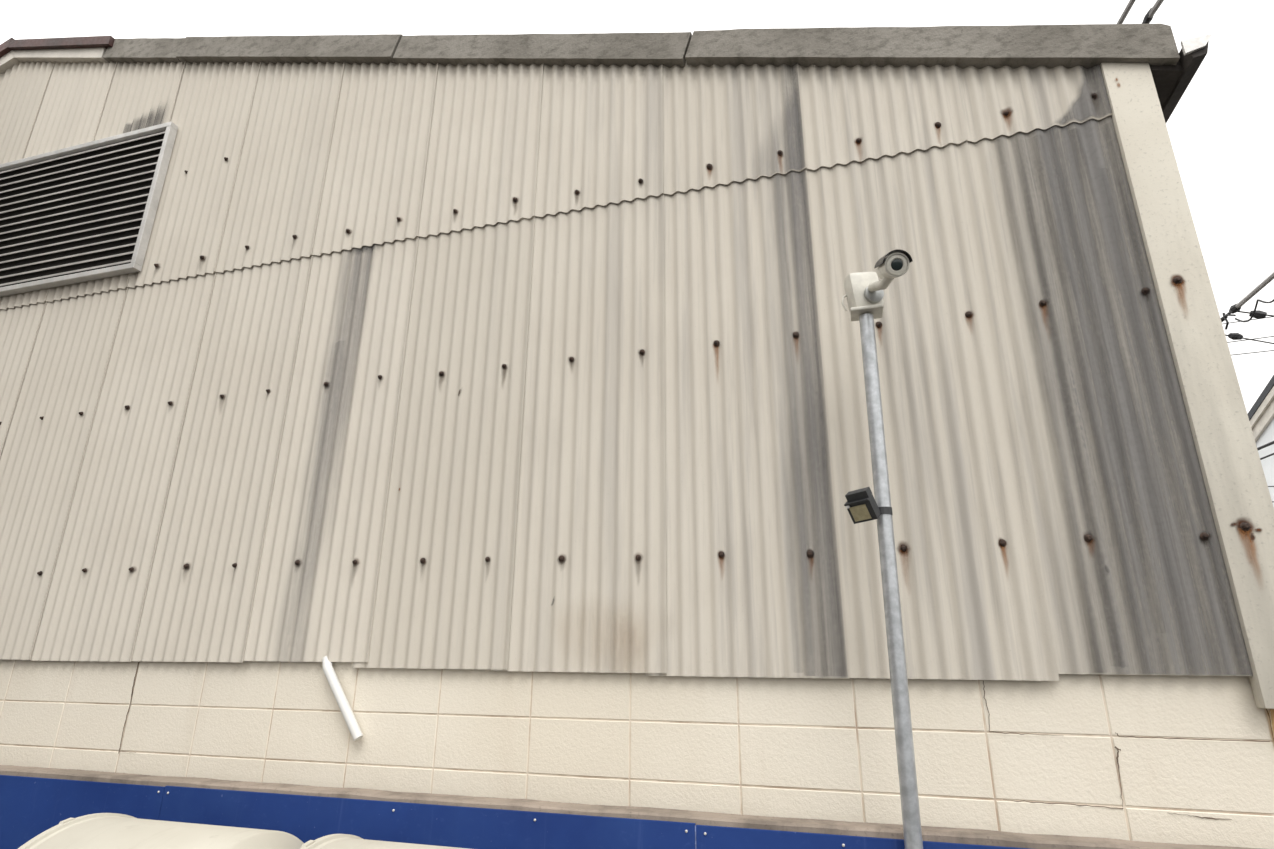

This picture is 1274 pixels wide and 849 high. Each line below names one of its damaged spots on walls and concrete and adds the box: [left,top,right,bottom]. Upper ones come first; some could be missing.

leakage [789,66,805,266]
leakage [1035,65,1253,676]
corrosion [1231,519,1262,557]
crack [1003,709,1274,809]